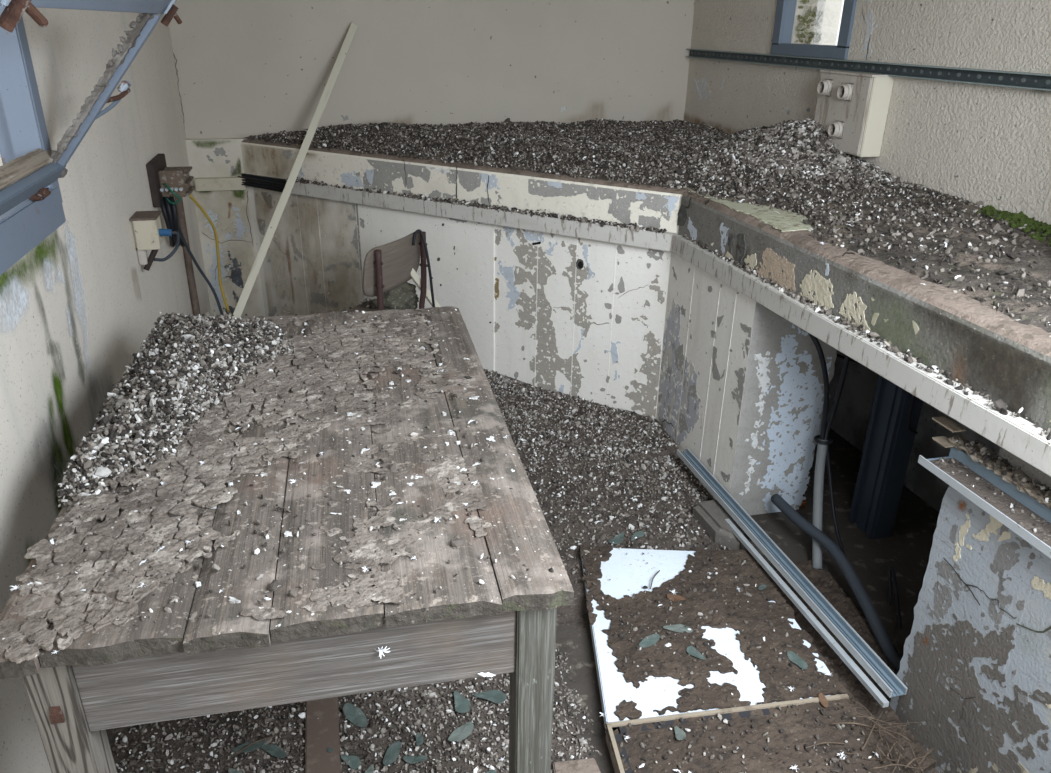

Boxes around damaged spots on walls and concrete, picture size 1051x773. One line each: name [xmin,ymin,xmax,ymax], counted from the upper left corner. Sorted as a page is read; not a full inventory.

peeling [340,159,502,205]
peeling [528,179,697,240]
water stain [0,281,29,330]
water stain [44,229,87,381]
peeling [711,222,888,331]
peeling [494,226,832,513]
peeling [896,509,1051,773]
crack [943,558,1051,633]